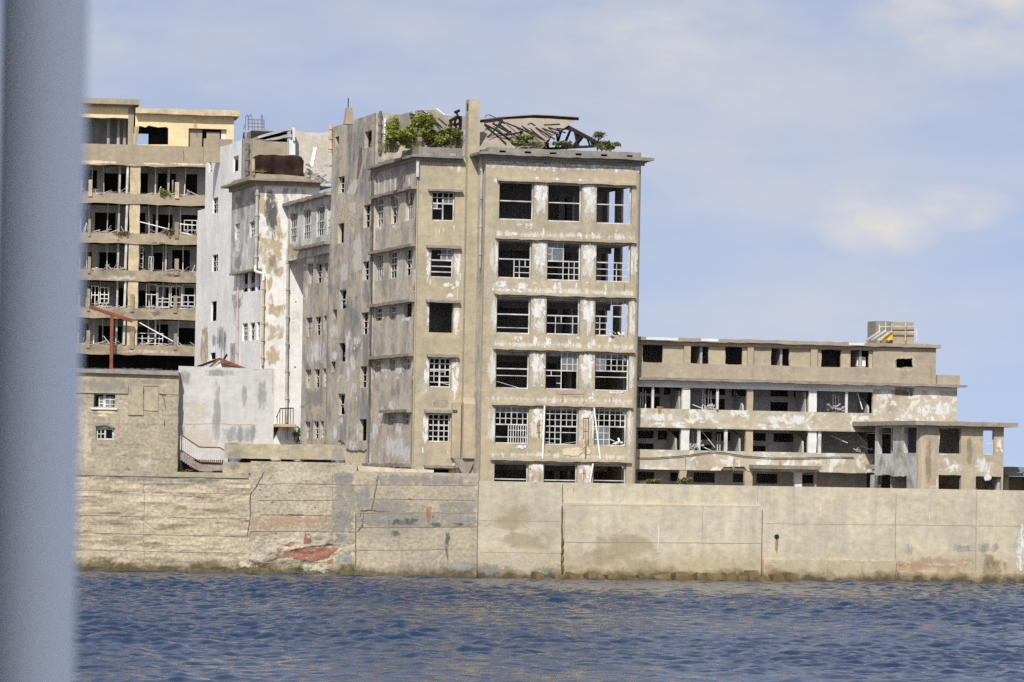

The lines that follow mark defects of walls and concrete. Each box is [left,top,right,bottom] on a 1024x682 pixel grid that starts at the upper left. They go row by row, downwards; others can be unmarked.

peeling [492,161,563,205]
peeling [577,164,618,208]
peeling [509,223,547,266]
peeling [577,232,596,263]
peeling [492,281,562,387]
peeling [568,282,612,379]
damp [214,399,255,467]
peeling [645,411,719,425]
peeling [894,400,957,421]
crack [247,472,264,537]
crack [264,477,383,574]
flaking render [240,529,351,575]